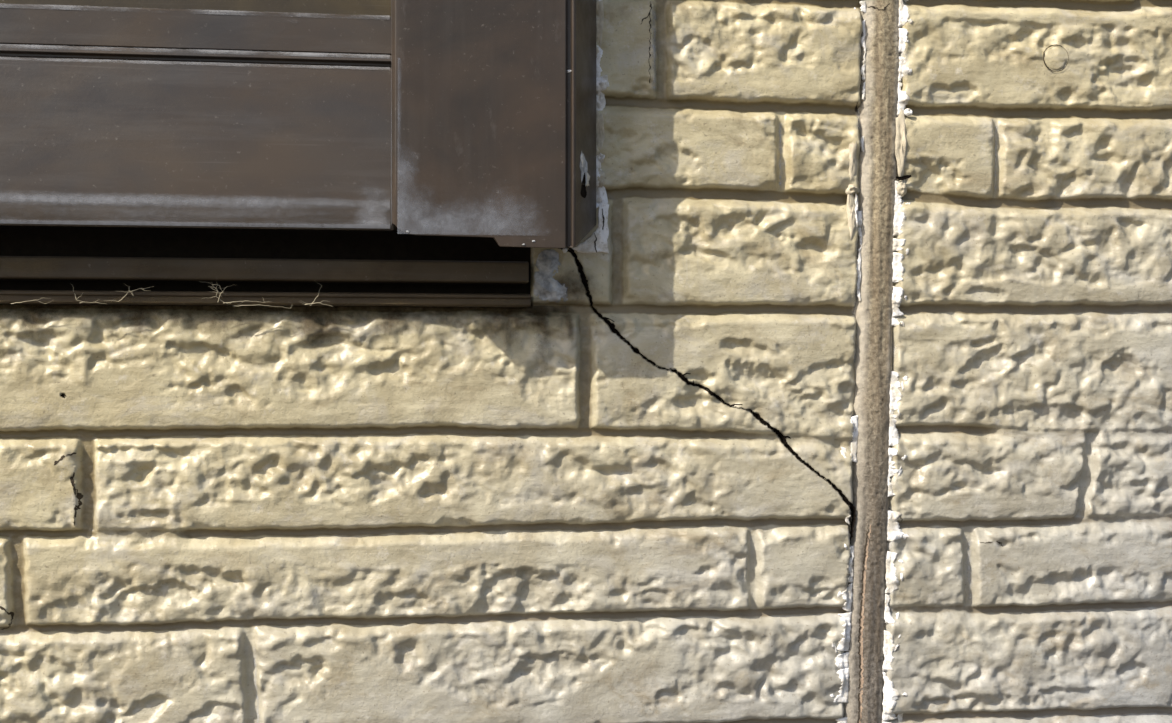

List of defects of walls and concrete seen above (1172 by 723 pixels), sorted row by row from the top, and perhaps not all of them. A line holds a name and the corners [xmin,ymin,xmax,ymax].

crack [54,453,83,526]
crack [558,209,903,723]